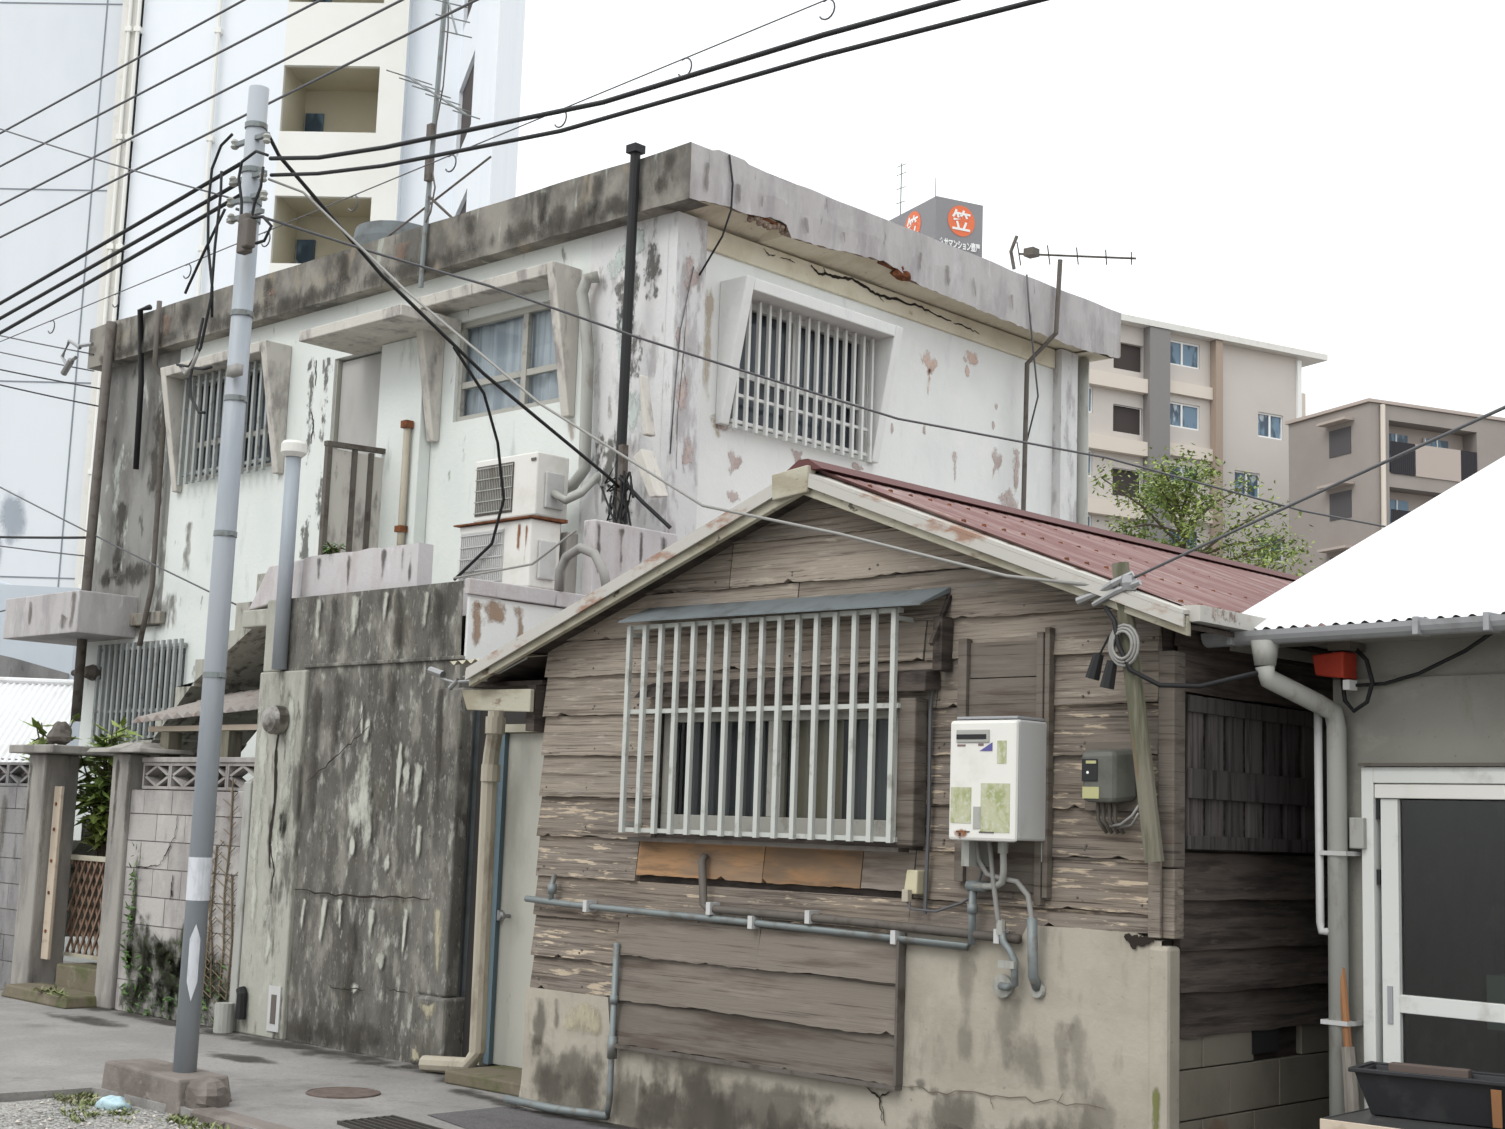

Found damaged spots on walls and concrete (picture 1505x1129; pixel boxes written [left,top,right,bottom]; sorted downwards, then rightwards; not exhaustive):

damp [253,175,628,317]
damp [615,243,662,377]
spalling [747,214,788,237]
crack [764,249,980,335]
spalling [877,261,911,282]
damp [592,436,643,561]
damp [101,503,147,586]
damp [394,565,411,644]
peeling [473,601,523,644]
damp [534,1003,557,1043]
damp [535,1055,597,1121]
crack [867,1086,1106,1123]